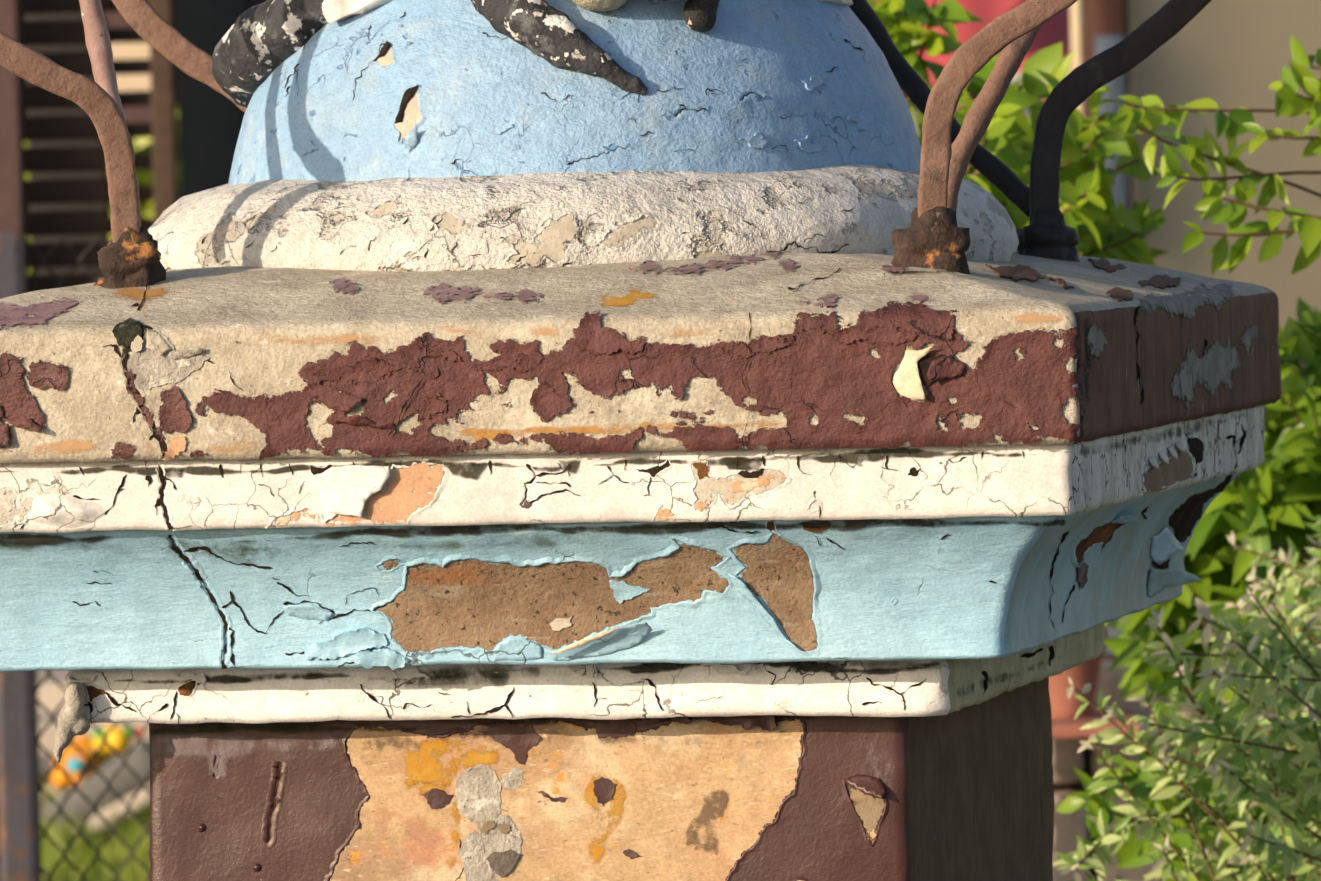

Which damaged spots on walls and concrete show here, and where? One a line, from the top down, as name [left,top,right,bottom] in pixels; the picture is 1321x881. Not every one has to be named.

peeling [372,41,397,70]
peeling [391,83,427,152]
peeling [0,353,71,451]
crack [72,285,514,719]
crack [488,459,651,506]
peeling [111,293,1108,682]
crack [797,455,844,550]
peeling [1140,427,1234,597]
crack [84,691,180,724]
crack [592,679,664,711]
crack [862,677,926,710]
peeling [324,715,808,881]